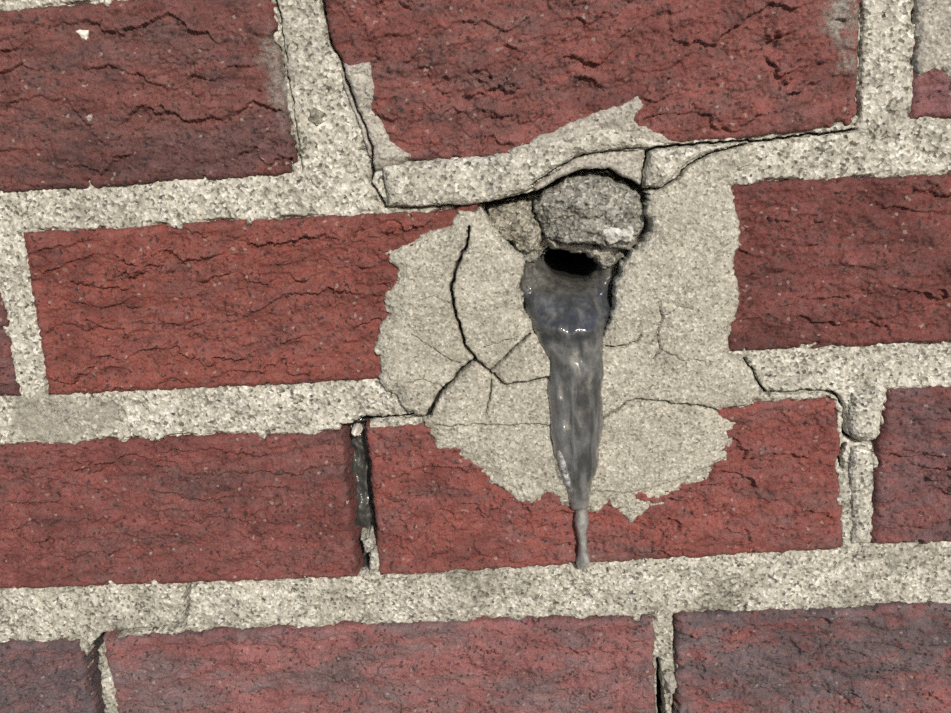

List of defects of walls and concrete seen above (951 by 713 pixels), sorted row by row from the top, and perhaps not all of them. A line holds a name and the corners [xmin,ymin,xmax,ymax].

crack [481,92,857,205]
peeling [642,141,748,187]
crack [360,225,527,422]
peeling [430,333,550,426]
peeling [754,375,769,400]
crack [806,388,851,464]
leakage [557,453,571,486]
peeling [587,464,713,523]
crack [93,632,105,648]
crack [656,654,675,713]